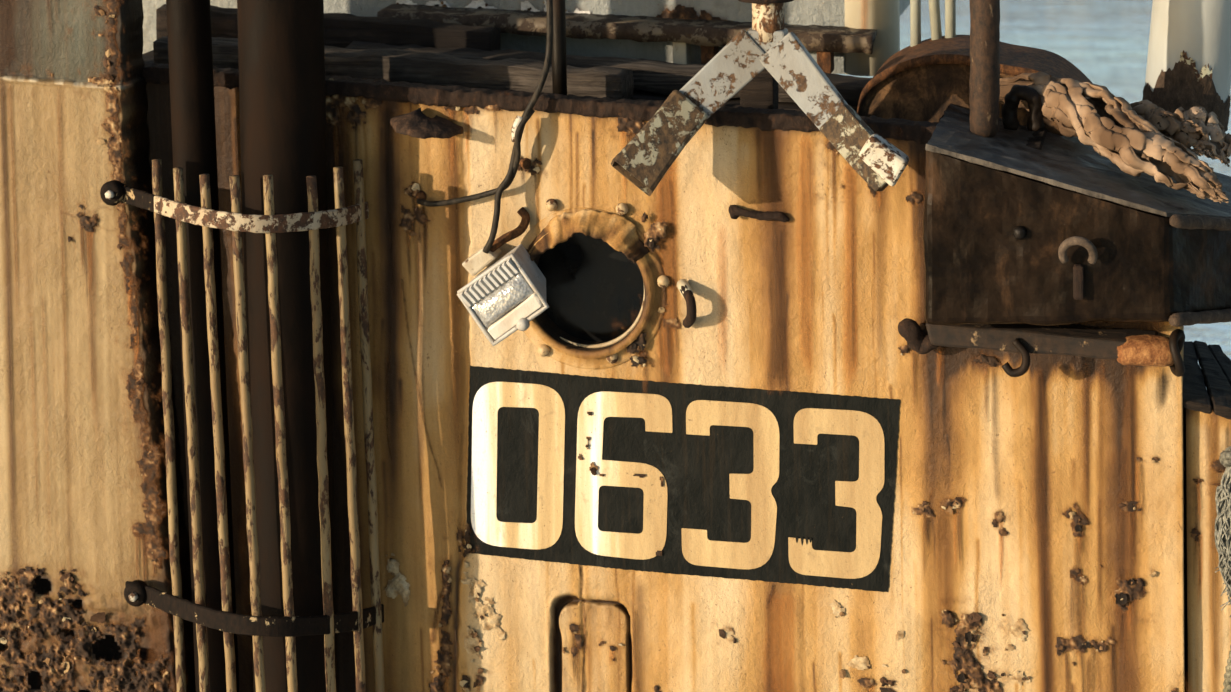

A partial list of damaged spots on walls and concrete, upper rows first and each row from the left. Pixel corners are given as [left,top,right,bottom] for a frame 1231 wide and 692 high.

rust [88,0,124,183]
rust [117,203,167,582]
rust [0,567,172,692]
peeling [385,553,410,607]
rust [429,560,484,692]
rust [857,677,895,692]
rust [940,609,1004,692]
rust [1035,372,1159,692]